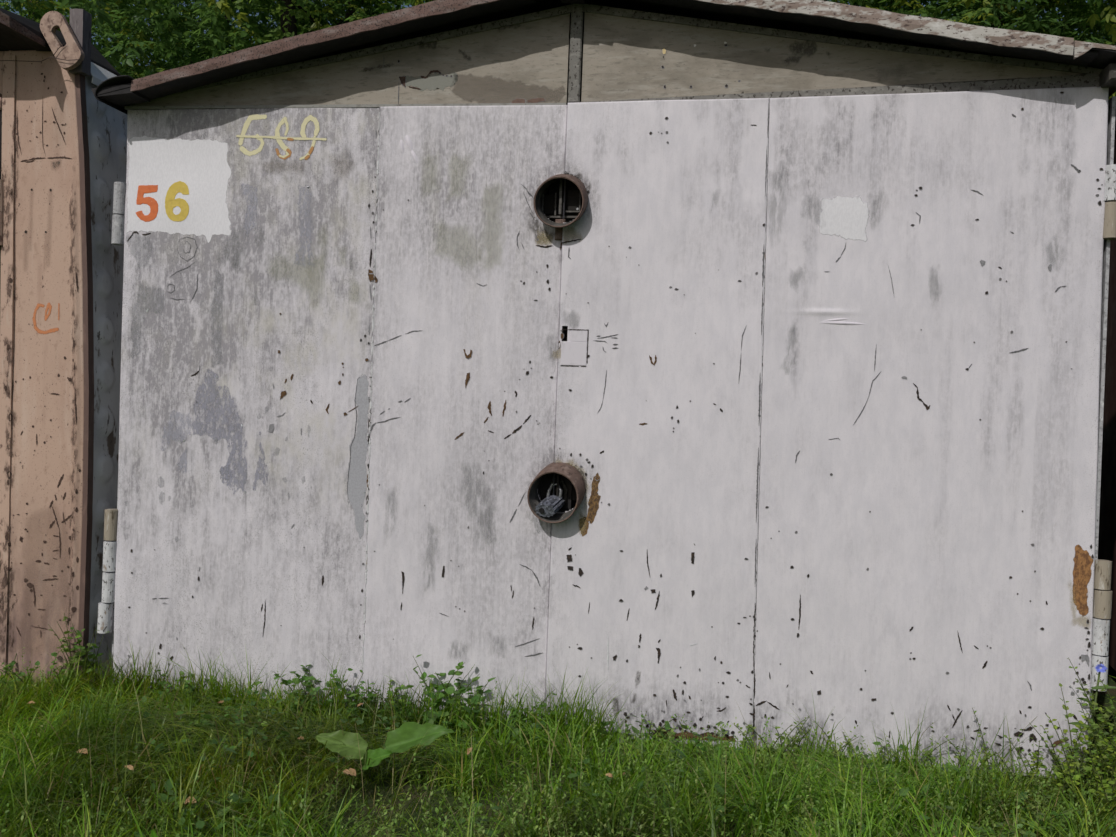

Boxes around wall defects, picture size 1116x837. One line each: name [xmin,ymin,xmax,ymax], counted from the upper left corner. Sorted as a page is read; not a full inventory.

peeling [399,70,458,91]
peeling [368,160,384,298]
peeling [163,369,285,493]
peeling [343,325,380,539]
rust [578,470,601,536]
rust [1073,545,1093,617]